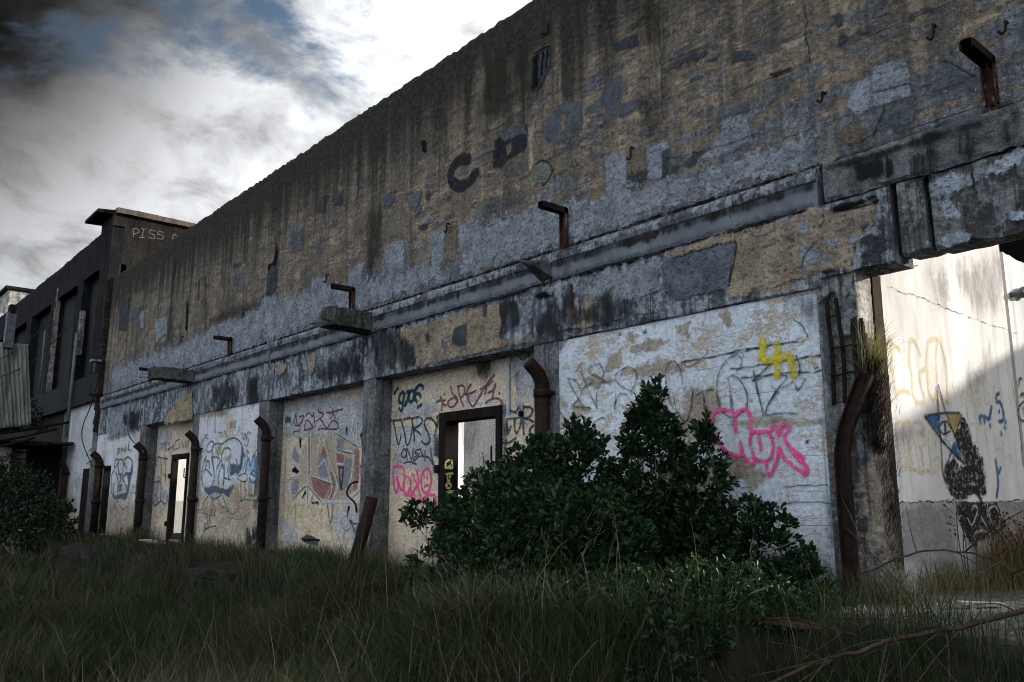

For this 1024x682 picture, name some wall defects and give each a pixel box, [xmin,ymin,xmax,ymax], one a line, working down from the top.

leakage [549,181,813,280]
peeling [92,102,879,458]
leakage [536,291,631,349]
peeling [152,482,169,514]
peeling [390,394,439,476]
peeling [720,455,766,491]